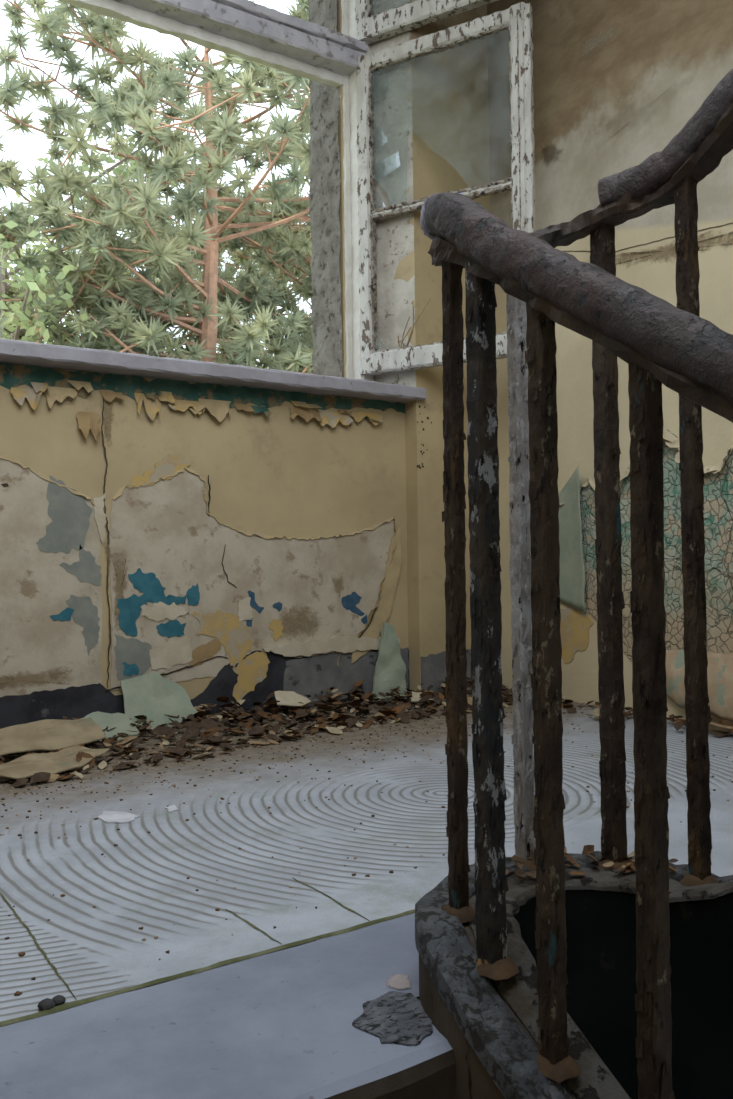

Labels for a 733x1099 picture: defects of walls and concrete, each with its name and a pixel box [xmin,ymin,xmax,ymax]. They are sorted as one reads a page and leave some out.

peeling [76,411,102,441]
peeling [10,380,271,422]
peeling [288,401,384,428]
crack [101,398,121,693]
crack [162,656,227,675]
peeling [0,455,402,697]
peeling [558,466,598,622]
peeling [620,466,633,662]
peeling [663,429,684,650]
peeling [703,443,733,654]